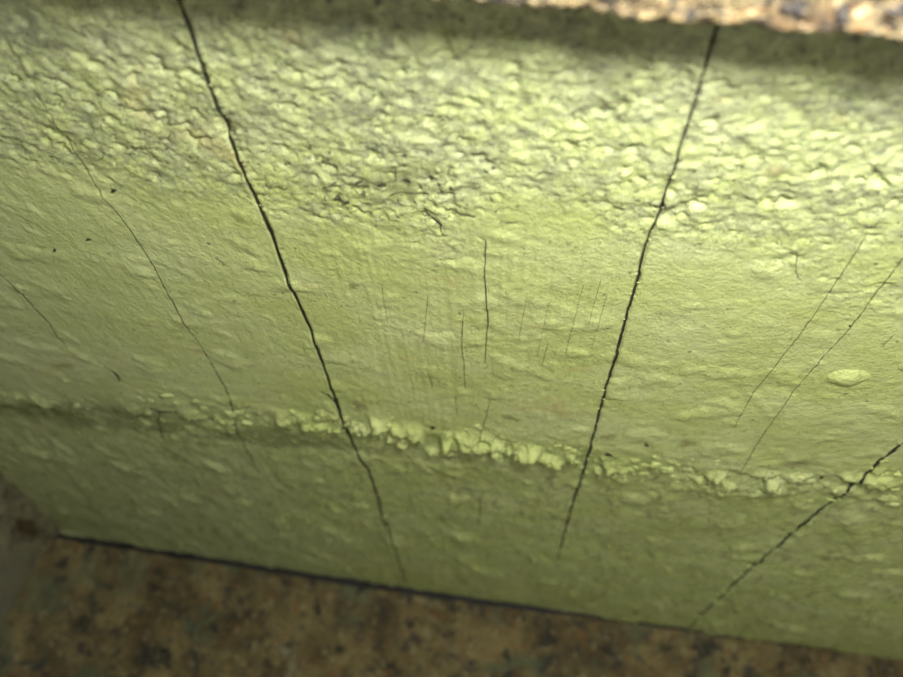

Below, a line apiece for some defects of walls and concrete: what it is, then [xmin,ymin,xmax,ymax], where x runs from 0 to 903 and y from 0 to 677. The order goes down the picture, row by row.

crack [0,32,259,474]
crack [177,0,406,582]
crack [461,237,489,385]
crack [556,24,719,559]
crack [689,443,903,628]
crack [735,224,903,473]